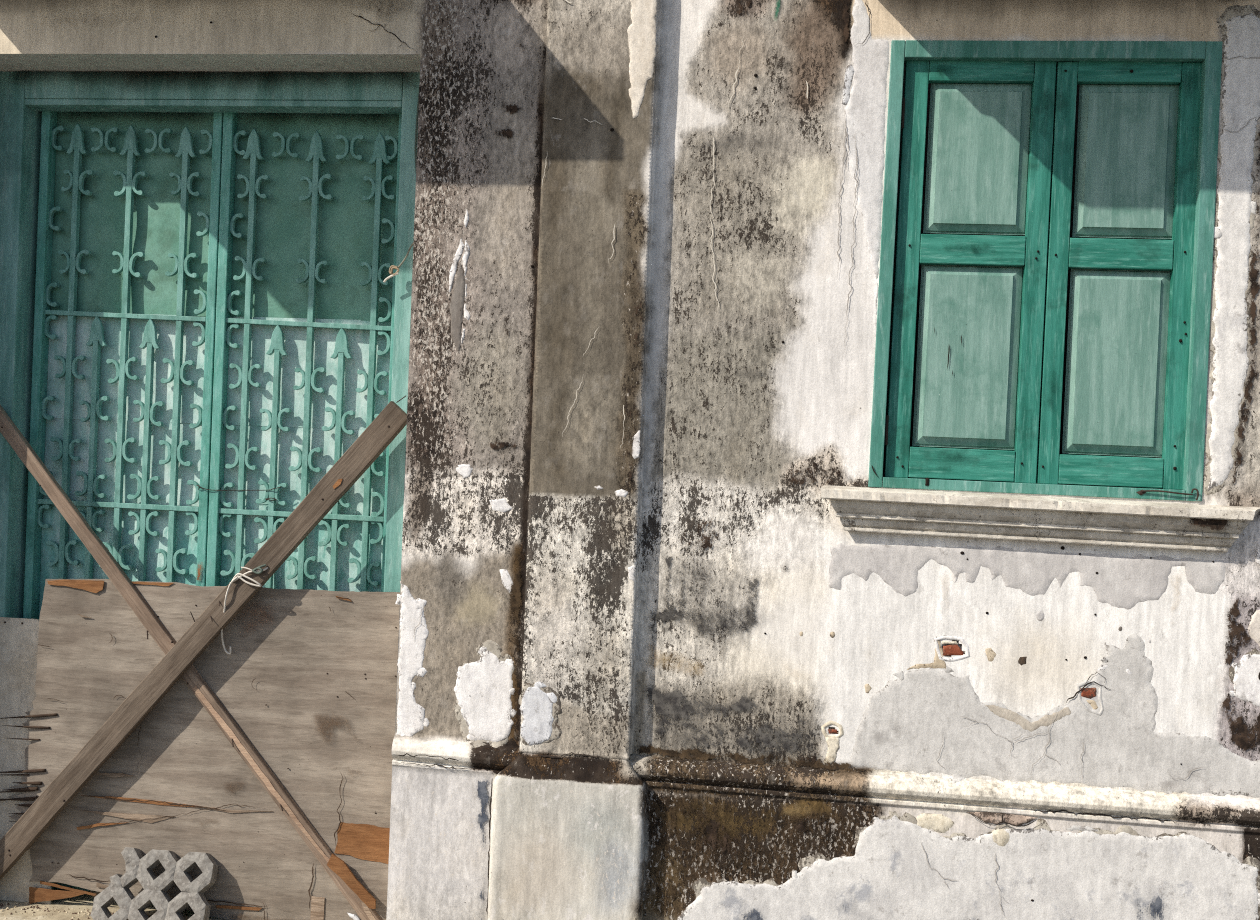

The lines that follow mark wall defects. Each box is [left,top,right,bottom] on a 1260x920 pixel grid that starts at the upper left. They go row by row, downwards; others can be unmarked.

crack [353,14,418,53]
peeling [627,0,659,118]
crack [837,111,859,343]
water stain [786,462,856,486]
water stain [681,519,720,551]
peeling [395,594,427,609]
water stain [651,556,758,640]
flaking render [934,635,970,673]
flaking render [1076,680,1104,716]
water stain [637,685,871,775]
flaking render [821,721,844,738]
water stain [1137,896,1167,920]